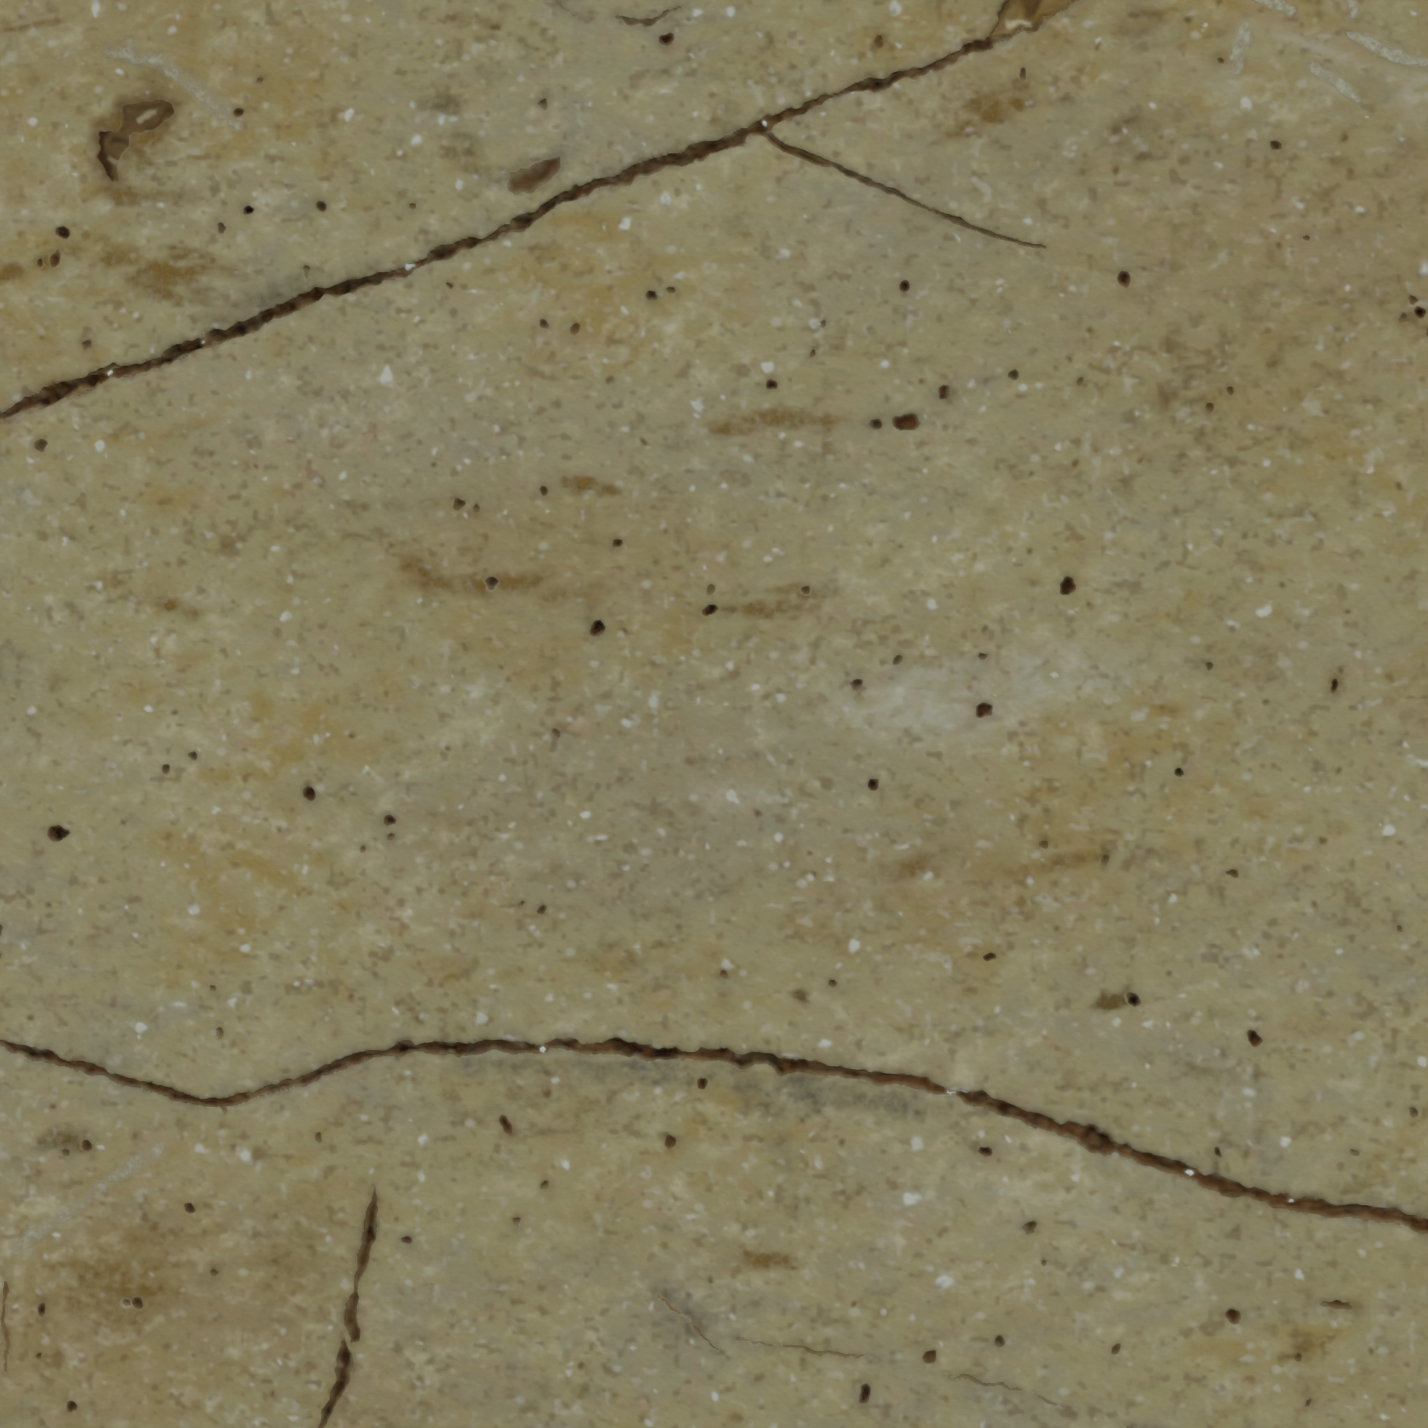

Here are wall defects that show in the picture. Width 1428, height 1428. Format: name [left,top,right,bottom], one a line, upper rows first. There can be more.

spalling [989,0,1074,37]
crack [0,0,1078,420]
crack [0,1037,1428,1234]
crack [319,1186,378,1428]